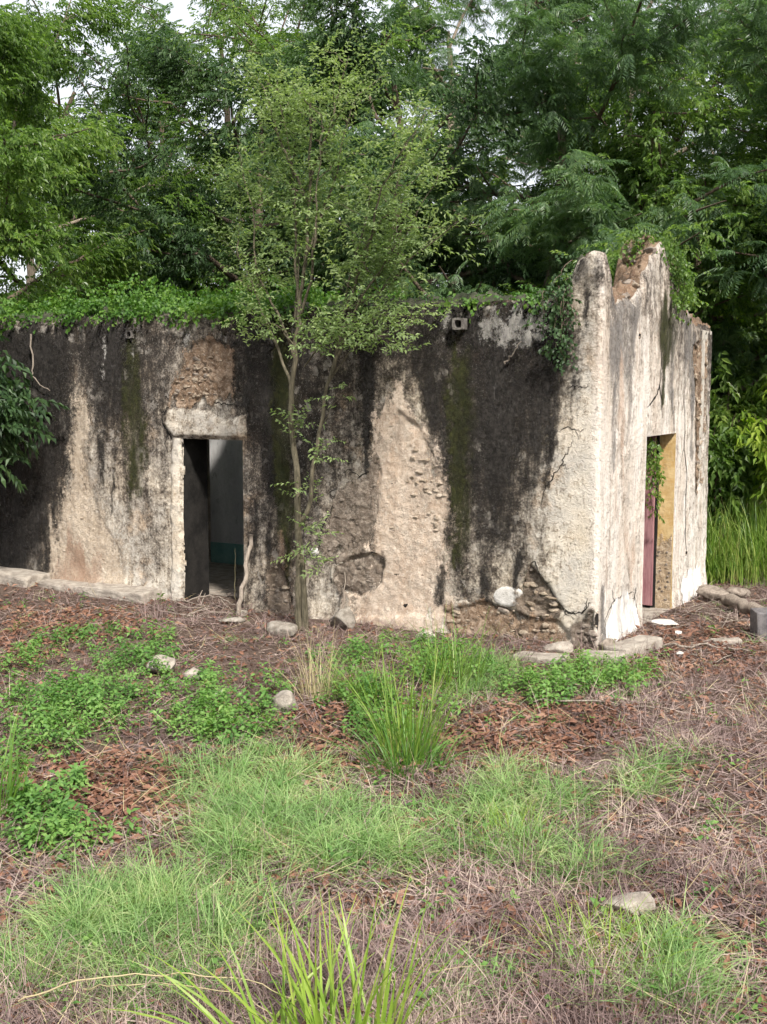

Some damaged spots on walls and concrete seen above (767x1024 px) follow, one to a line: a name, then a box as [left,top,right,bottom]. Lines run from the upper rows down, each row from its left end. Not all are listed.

water stain [0,318,134,573]
spalling [167,332,236,409]
water stain [217,314,283,561]
water stain [353,329,378,475]
water stain [434,565,446,605]
peeling [311,380,600,649]
water stain [479,566,491,603]
water stain [411,258,641,590]
crack [540,426,585,506]